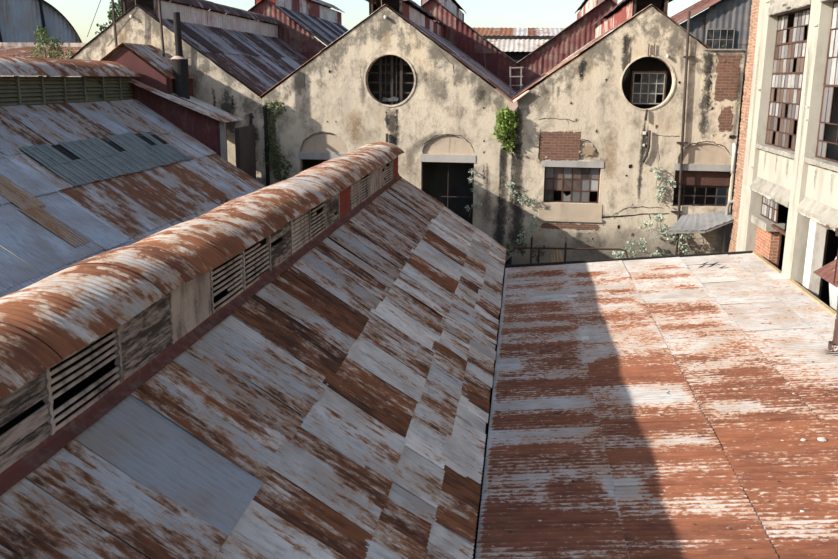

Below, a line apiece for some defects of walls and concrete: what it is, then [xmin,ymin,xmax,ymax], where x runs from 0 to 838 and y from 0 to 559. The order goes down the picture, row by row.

corrosion [0,173,89,247]
water stain [385,109,399,144]
water stain [493,109,525,245]
flaking render [537,118,596,163]
water stain [621,35,631,79]
crack [602,204,669,219]
water stain [698,53,713,135]
spalling [710,0,760,252]